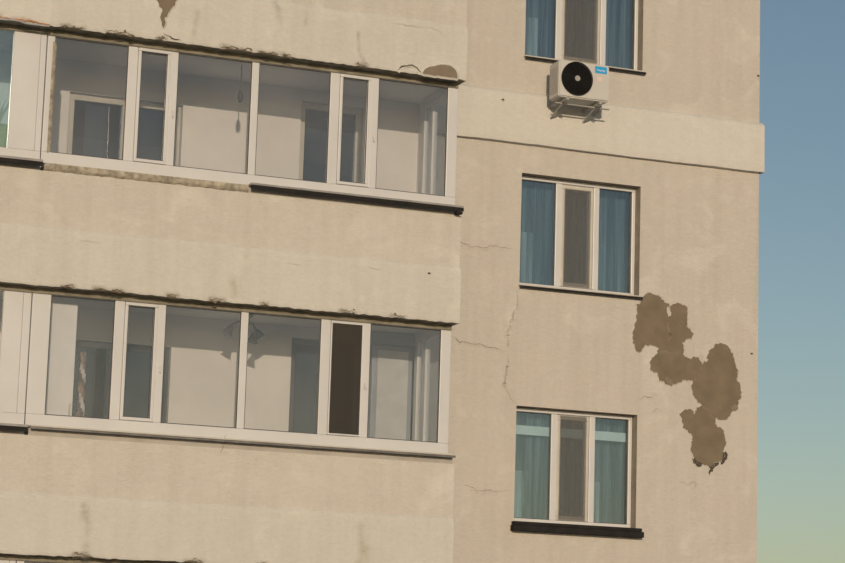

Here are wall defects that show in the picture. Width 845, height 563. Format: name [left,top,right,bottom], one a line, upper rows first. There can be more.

flaking render [155,0,179,40]
flaking render [398,63,459,81]
crack [451,289,520,405]
flaking render [632,292,742,475]